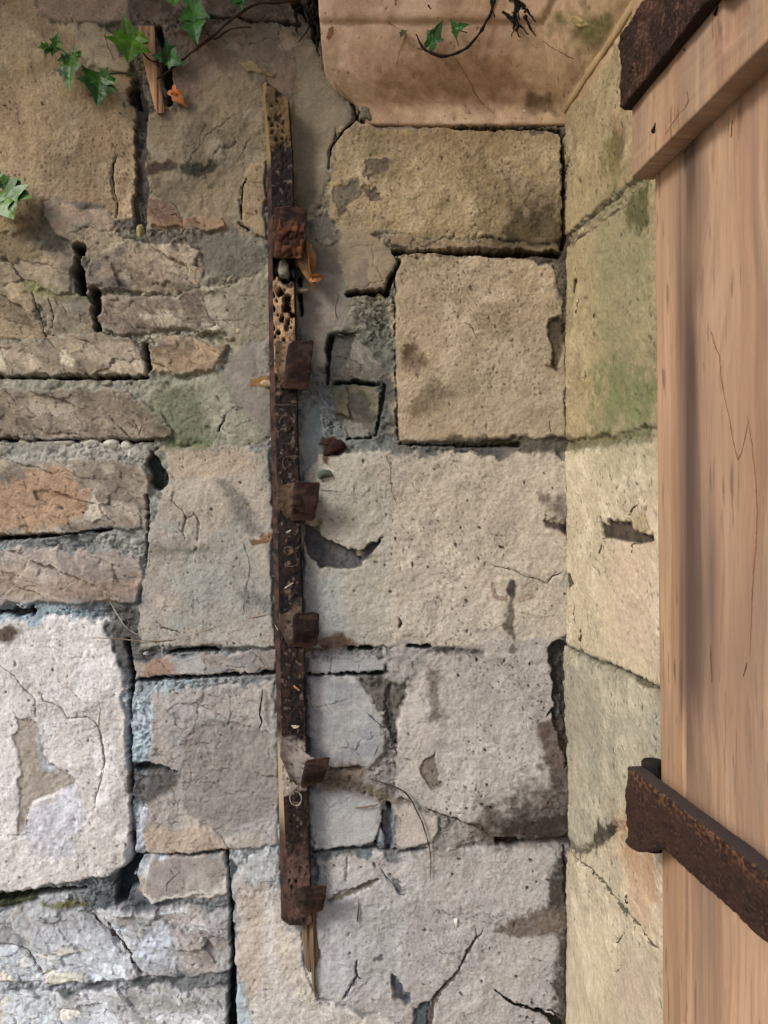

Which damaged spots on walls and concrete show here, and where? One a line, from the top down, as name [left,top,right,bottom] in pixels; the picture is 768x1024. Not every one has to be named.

spalling [548,316,566,370]
corrosion [319,437,347,464]
spalling [304,524,381,568]
spalling [601,512,654,544]
spalling [12,716,75,835]
crack [2,944,44,975]
crack [95,914,142,972]
crack [426,927,483,1024]